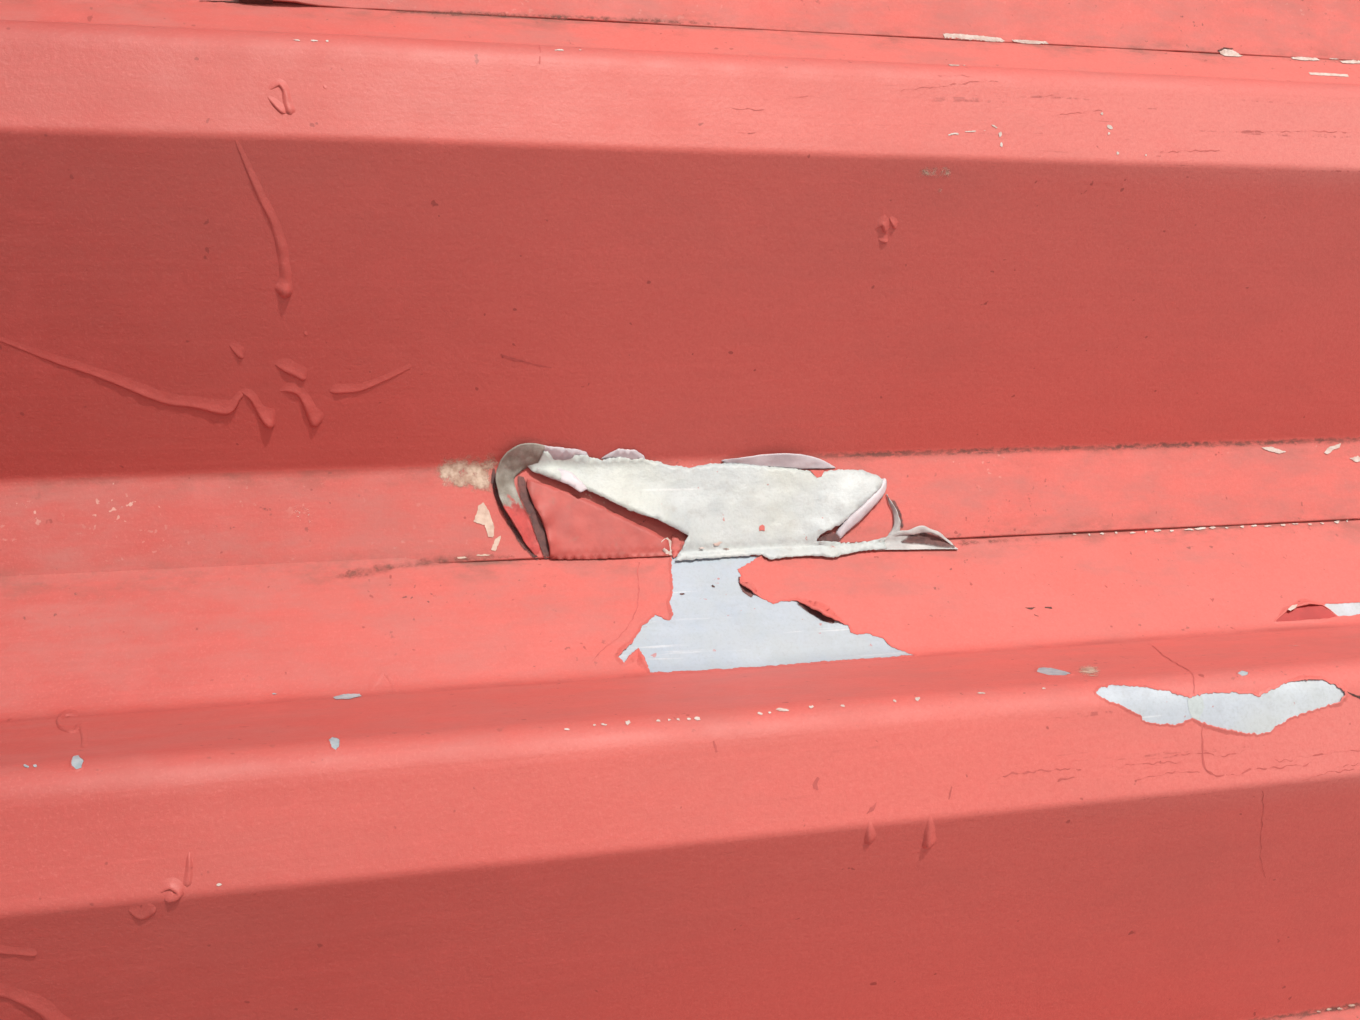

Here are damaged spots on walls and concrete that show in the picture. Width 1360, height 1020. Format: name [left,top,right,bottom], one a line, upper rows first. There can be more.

peeling [457,443,958,675]
peeling [1274,598,1360,624]
peeling [1093,670,1349,738]